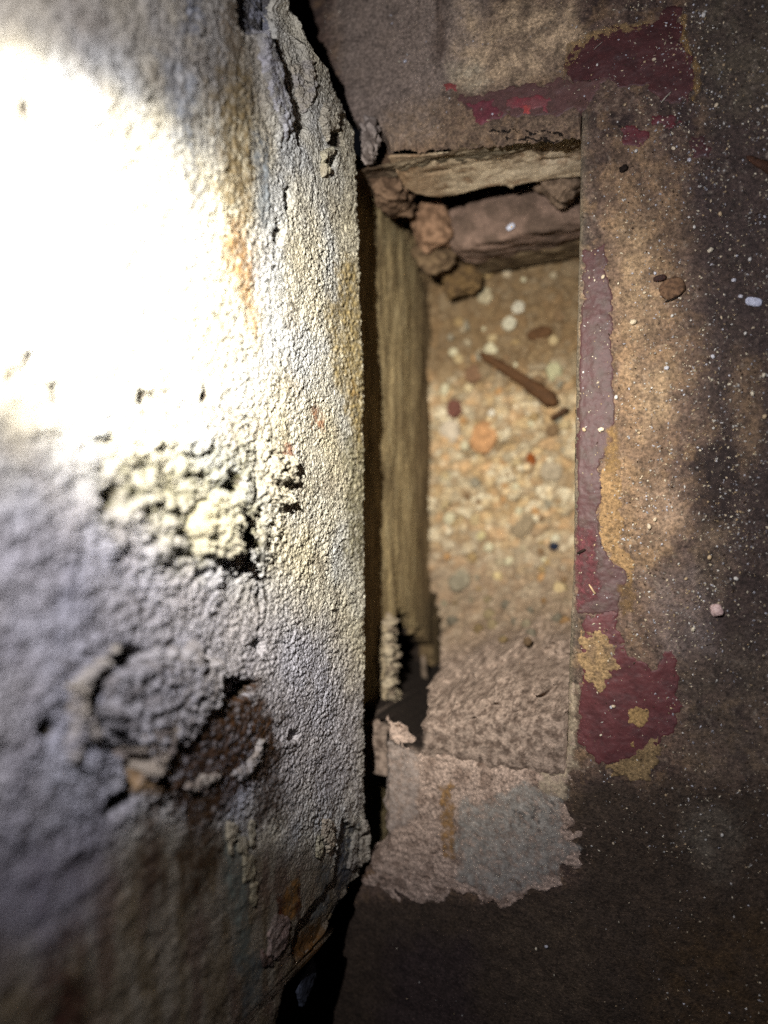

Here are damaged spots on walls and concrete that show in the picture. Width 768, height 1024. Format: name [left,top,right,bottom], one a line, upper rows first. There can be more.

peeling [443,5,700,147]
spalling [219,471,243,493]
peeling [575,244,683,781]